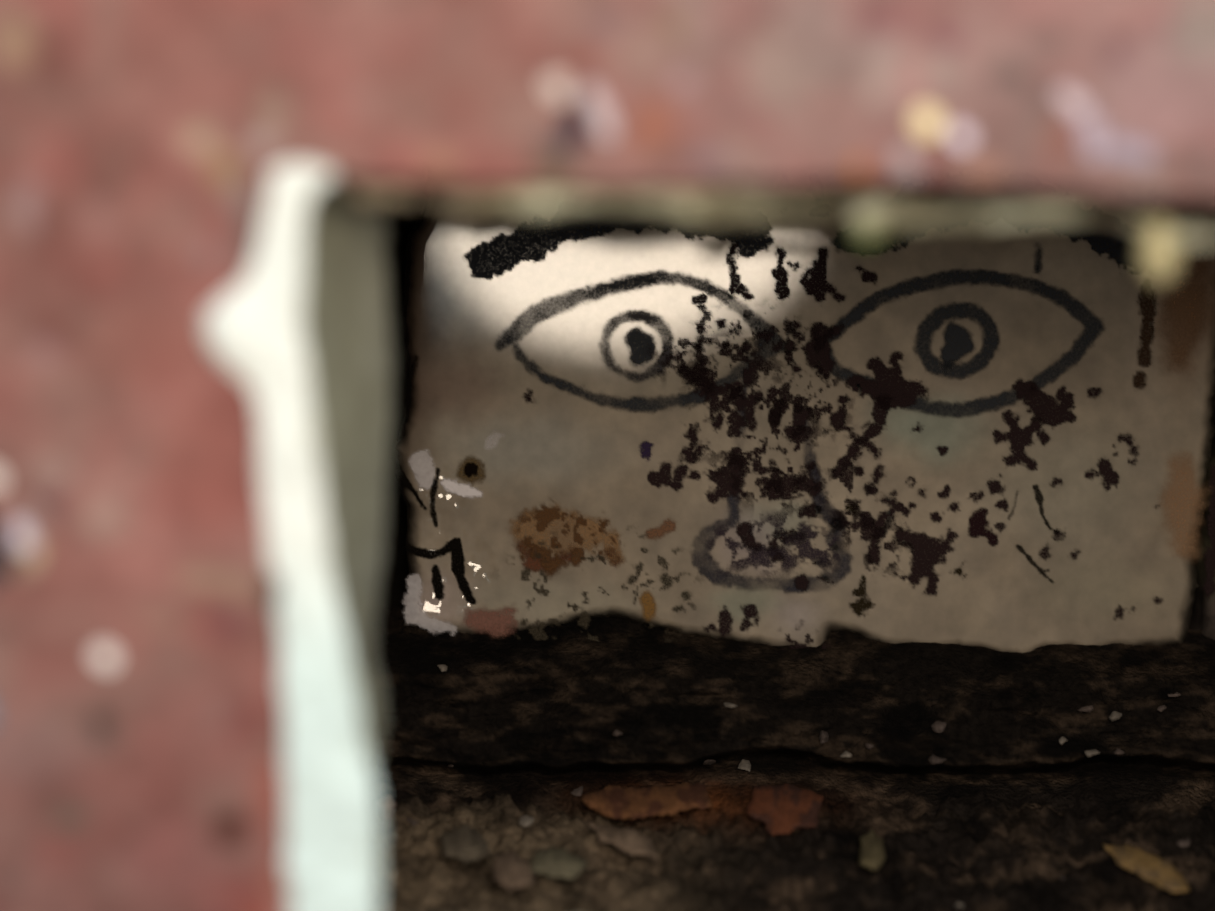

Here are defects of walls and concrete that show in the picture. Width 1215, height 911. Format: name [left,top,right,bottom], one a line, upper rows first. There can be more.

spalling [410,451,485,497]
corrosion [513,506,622,576]
spalling [405,575,456,632]